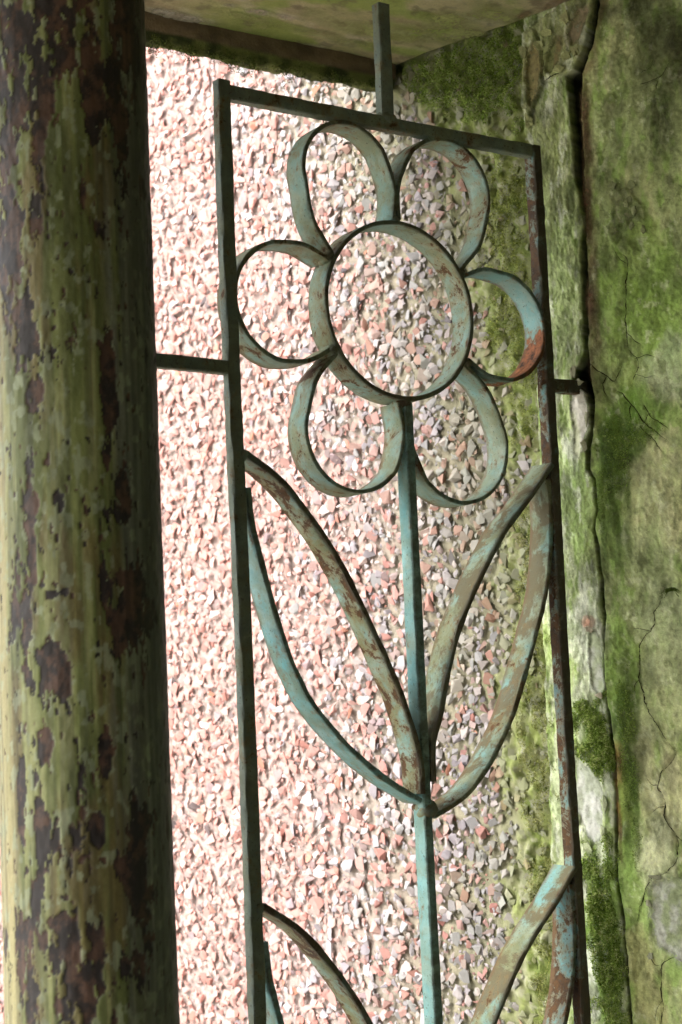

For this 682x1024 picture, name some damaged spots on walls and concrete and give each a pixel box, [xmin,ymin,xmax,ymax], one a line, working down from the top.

spalling [146,47,376,360]
spalling [231,103,540,707]
spalling [393,7,588,140]
crack [591,252,668,449]
spalling [157,369,248,1024]
spalling [245,472,403,786]
spalling [251,596,424,1024]
spalling [430,518,529,801]
spalling [432,647,553,1024]
crack [634,591,682,926]
crack [651,957,682,1024]